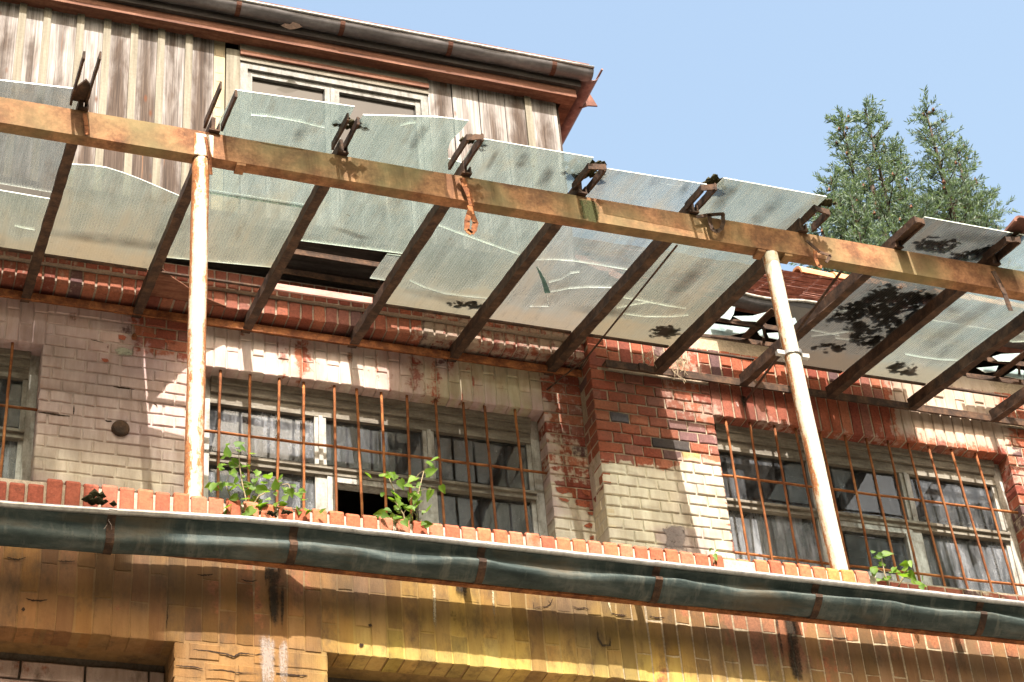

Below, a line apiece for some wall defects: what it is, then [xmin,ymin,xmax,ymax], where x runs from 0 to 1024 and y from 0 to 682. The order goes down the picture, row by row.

peeling [555,487,594,540]
leakage [265,567,284,624]